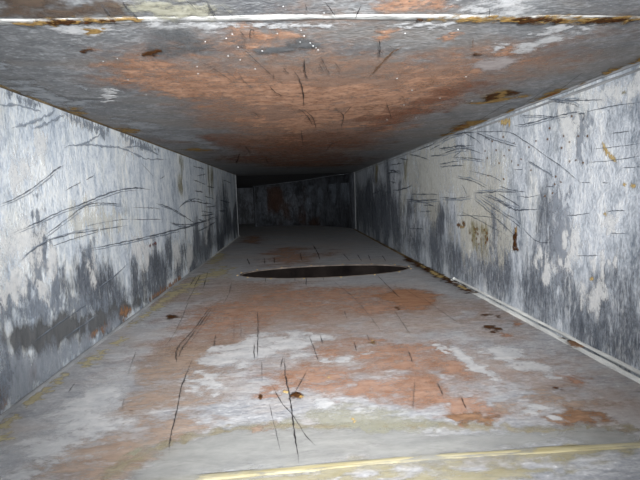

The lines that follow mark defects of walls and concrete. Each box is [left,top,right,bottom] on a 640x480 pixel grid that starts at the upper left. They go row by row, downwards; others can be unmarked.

corrosion [226,24,302,55]
corrosion [455,14,640,25]
corrosion [100,48,581,168]
leakage [304,160,512,305]
corrosion [457,221,488,245]
leakage [0,181,238,409]
leakage [518,184,640,373]
corrosion [29,284,444,480]
leakage [185,332,373,397]
corrosion [254,338,516,428]
leakage [432,340,562,381]
corrosion [523,387,614,428]